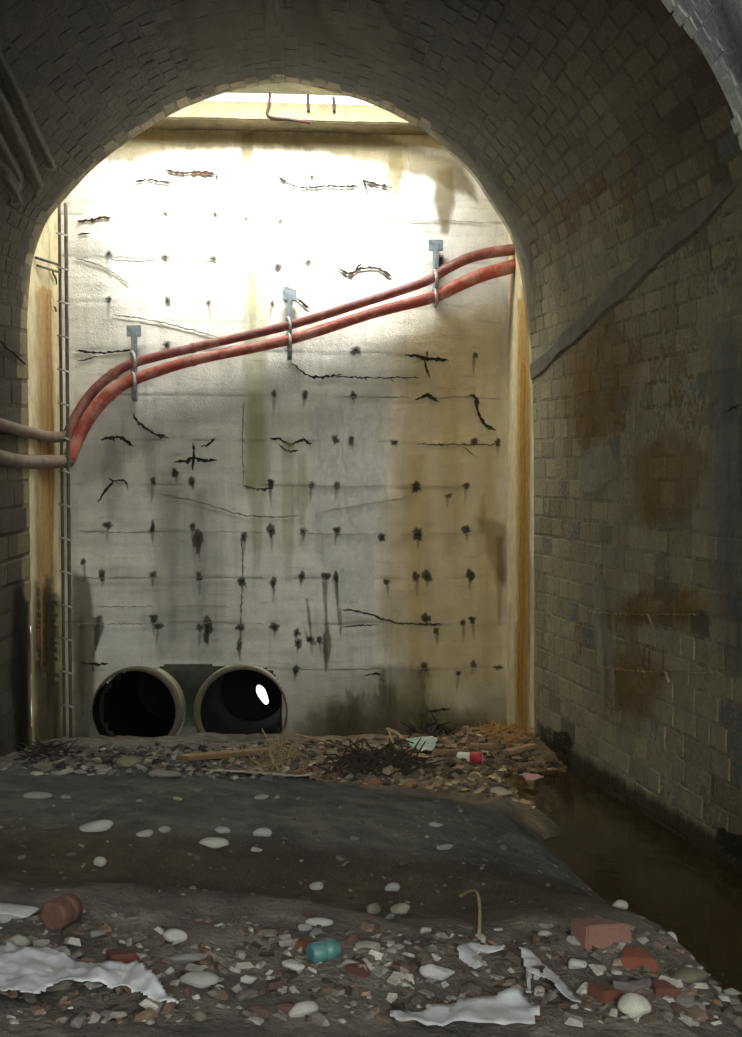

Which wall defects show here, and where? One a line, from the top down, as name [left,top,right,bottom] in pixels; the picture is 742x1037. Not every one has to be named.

crack [134,169,218,184]
damp [242,134,252,167]
crack [275,176,392,195]
damp [388,150,402,194]
crack [76,216,219,284]
crack [337,263,393,277]
damp [436,141,535,325]
crack [113,314,216,337]
crack [76,349,131,362]
crack [292,352,500,455]
crack [77,405,505,655]
damp [306,582,341,669]